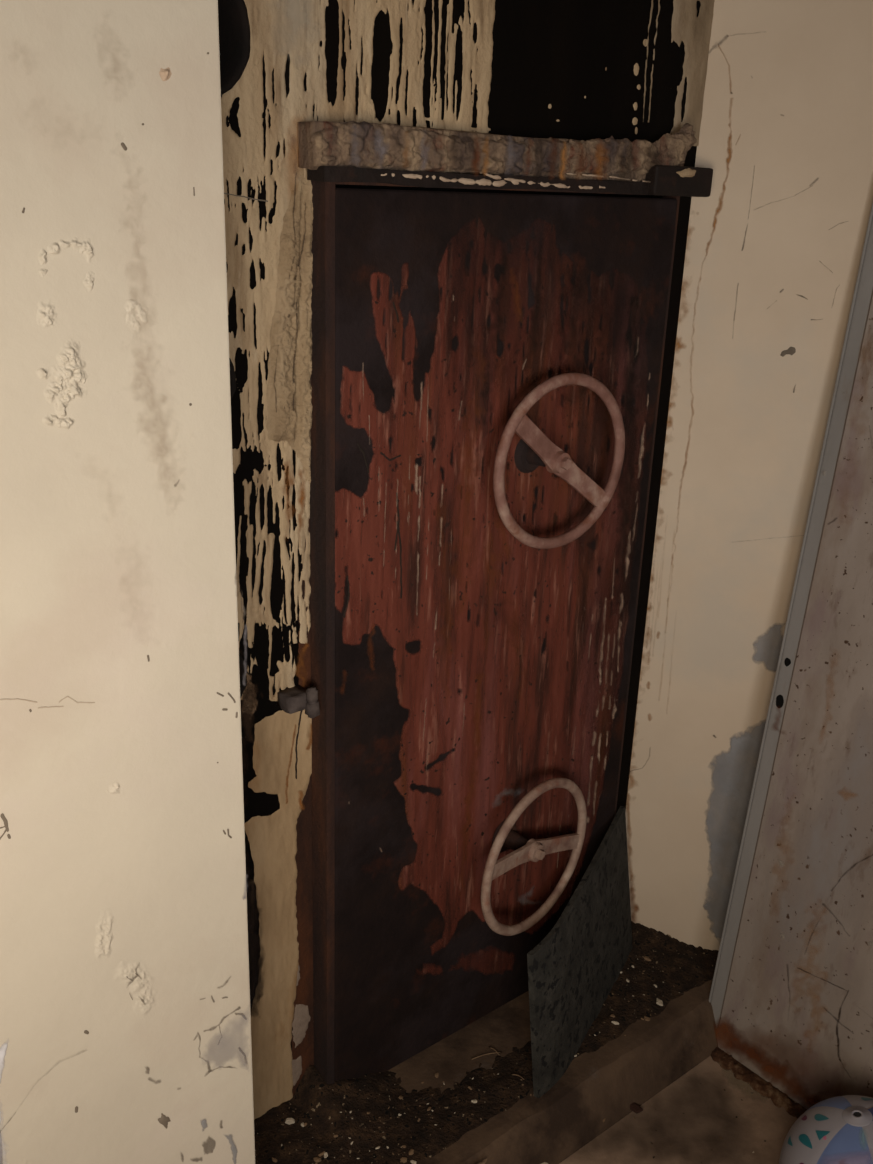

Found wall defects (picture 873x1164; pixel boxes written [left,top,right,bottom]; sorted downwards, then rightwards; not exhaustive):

peeling [221,0,715,467]
peeling [199,697,312,1120]
corrosion [286,710,312,808]
peeling [335,249,620,953]